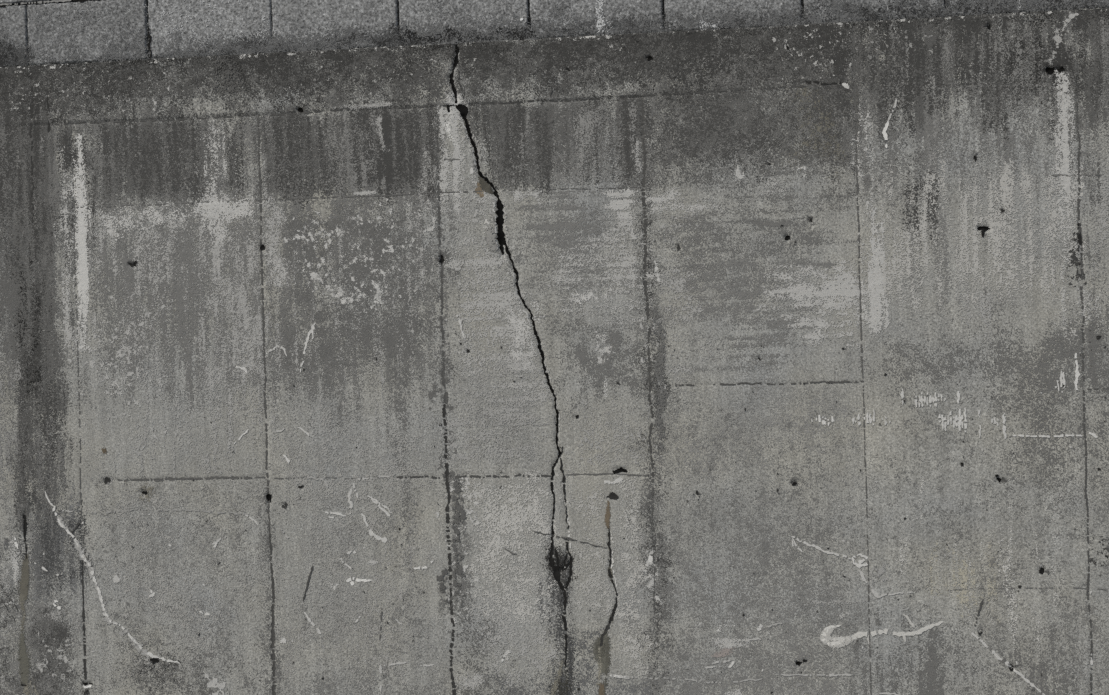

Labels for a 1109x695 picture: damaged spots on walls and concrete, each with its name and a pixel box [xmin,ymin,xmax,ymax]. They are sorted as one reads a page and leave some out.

crack [449,44,618,667]